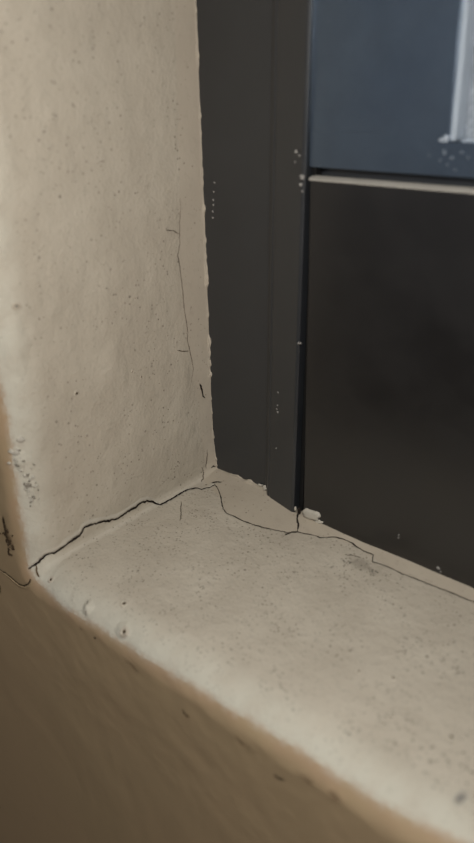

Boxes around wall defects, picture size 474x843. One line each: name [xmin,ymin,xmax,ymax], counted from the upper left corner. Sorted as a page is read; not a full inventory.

crack [166,201,205,398]
crack [0,453,473,602]